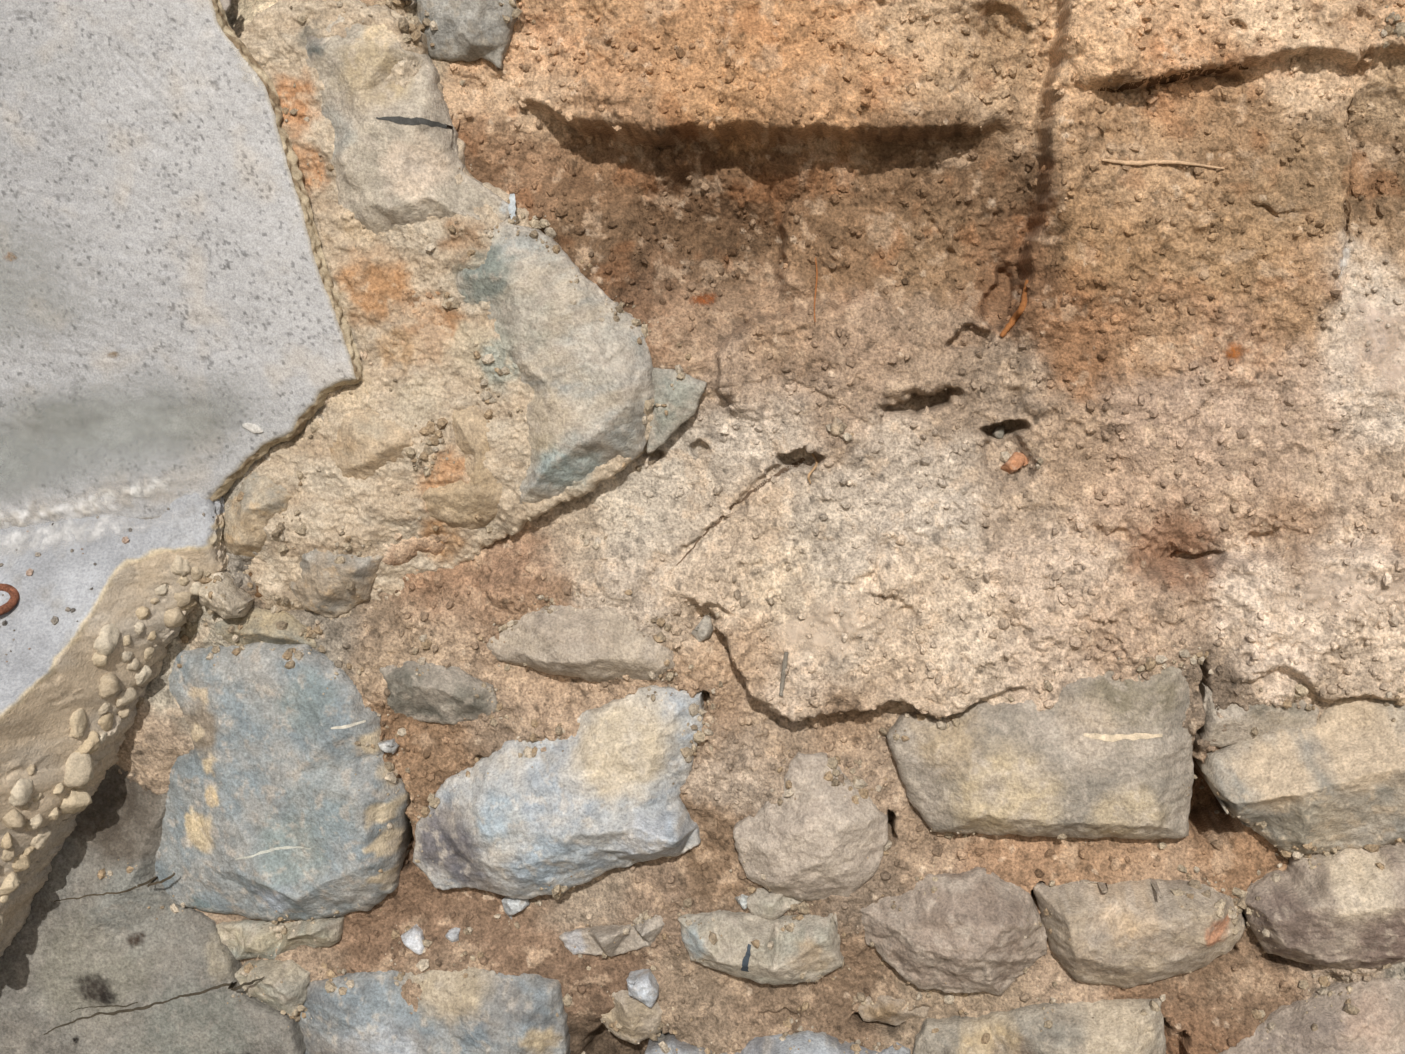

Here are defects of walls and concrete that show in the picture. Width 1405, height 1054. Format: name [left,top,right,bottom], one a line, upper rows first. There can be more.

spalling [376,116,453,130]
spalling [508,194,516,222]
spalling [691,615,713,642]
spalling [378,738,399,754]
spalling [1084,733,1162,742]
spalling [235,846,311,860]
spalling [501,896,530,920]
spalling [735,894,748,909]
spalling [401,924,425,955]
spalling [445,927,460,942]
spalling [741,944,751,972]
spalling [626,969,659,1008]